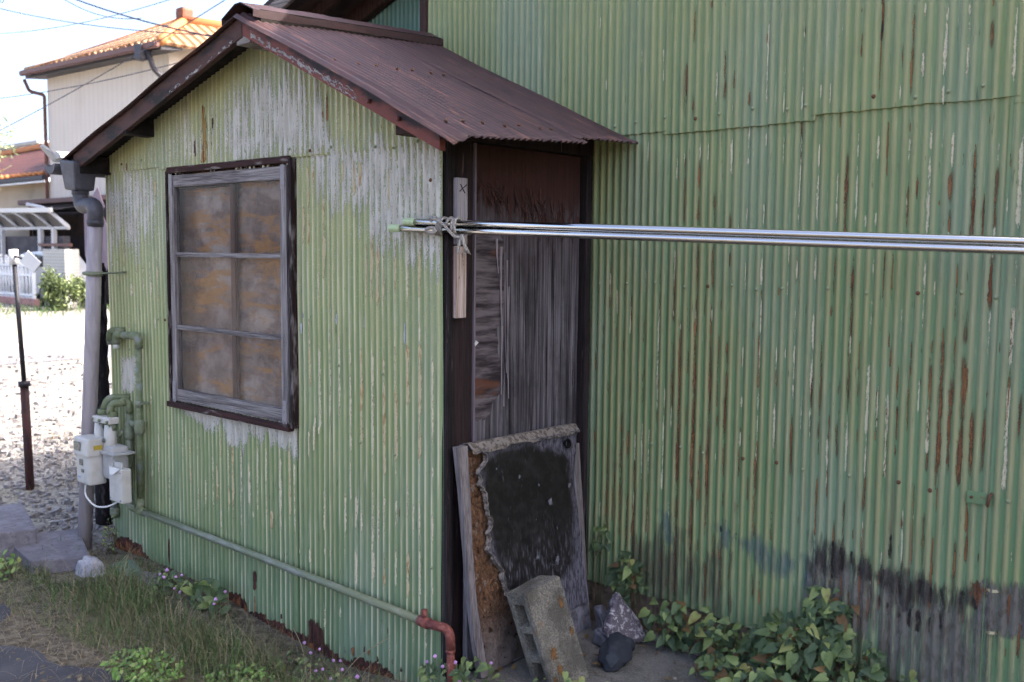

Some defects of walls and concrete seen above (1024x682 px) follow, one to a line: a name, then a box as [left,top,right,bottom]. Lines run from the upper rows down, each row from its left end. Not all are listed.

corrosion [902,18,915,87]
corrosion [194,106,214,163]
peeling [106,33,442,297]
corrosion [836,156,849,231]
corrosion [938,145,1011,245]
peeling [151,309,434,586]
corrosion [876,328,986,507]
corrosion [1005,377,1022,434]
corrosion [114,534,150,560]
corrosion [229,571,402,679]
water stain [804,541,1024,682]